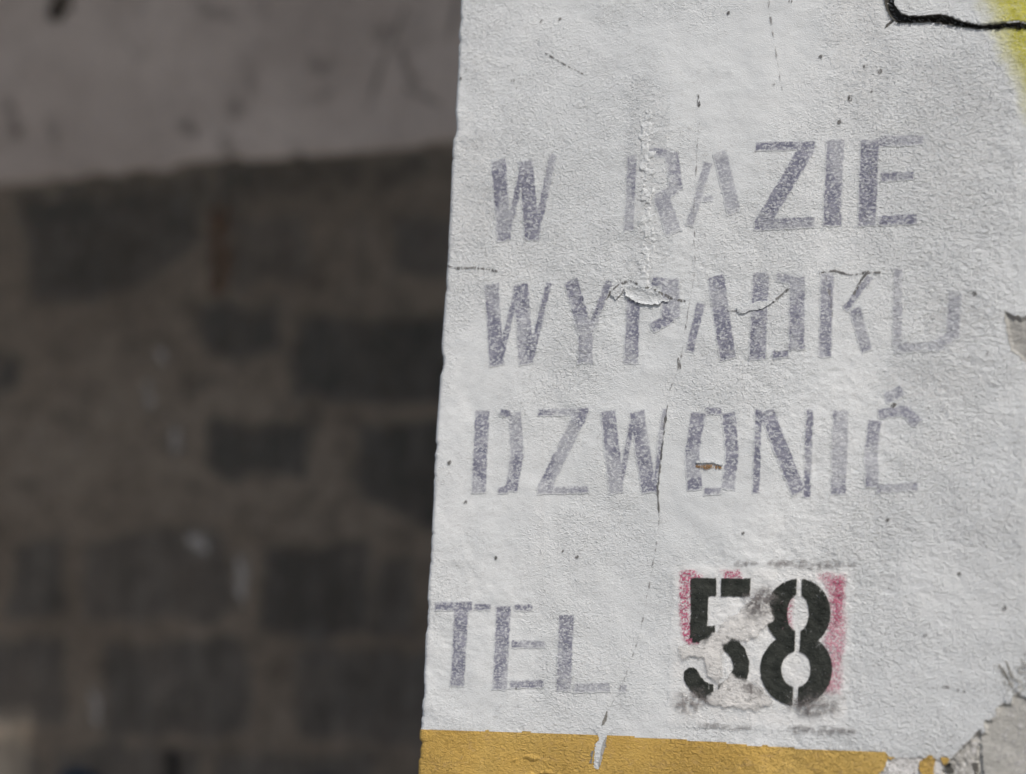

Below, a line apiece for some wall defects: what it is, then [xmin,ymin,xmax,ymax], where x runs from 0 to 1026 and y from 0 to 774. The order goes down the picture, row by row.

crack [884,0,1026,30]
peeling [620,74,673,313]
flaking render [1004,311,1026,362]
flaking render [880,661,1026,774]